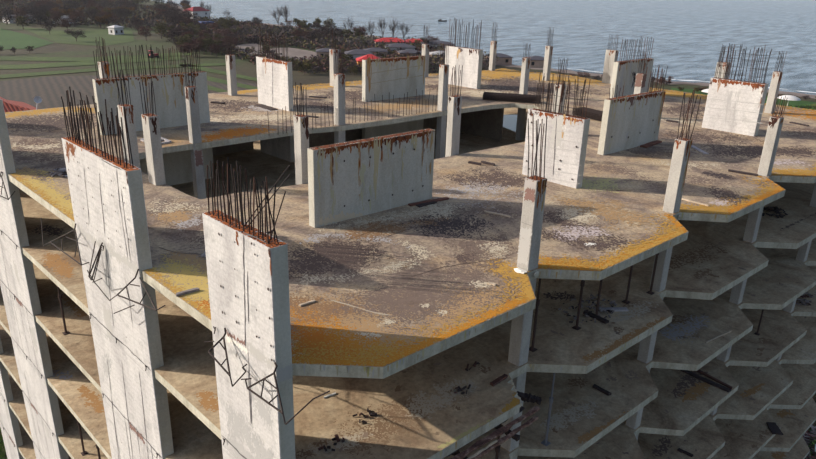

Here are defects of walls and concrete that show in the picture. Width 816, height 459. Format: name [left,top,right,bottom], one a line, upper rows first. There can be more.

rust [94,61,204,107]
rust [256,56,289,74]
rust [293,45,448,93]
rust [362,97,438,115]
rust [481,57,610,102]
rust [528,108,588,138]
rust [609,50,652,81]
rust [607,62,782,125]
rust [769,105,816,129]
rust [295,114,434,182]
rust [148,209,286,274]
rust [289,138,816,367]